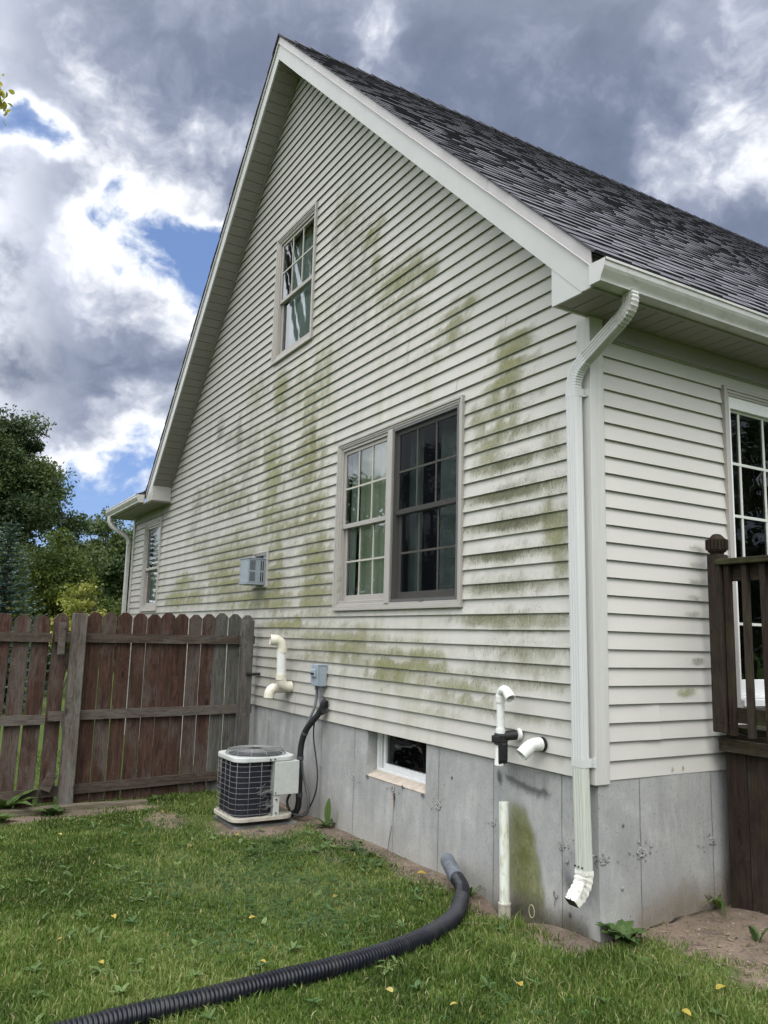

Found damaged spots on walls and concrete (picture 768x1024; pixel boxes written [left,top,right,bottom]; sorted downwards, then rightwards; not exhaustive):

water stain [381,257,436,311]
water stain [472,328,533,471]
water stain [478,478,561,500]
water stain [207,373,445,682]
water stain [473,508,566,571]
water stain [468,614,564,631]